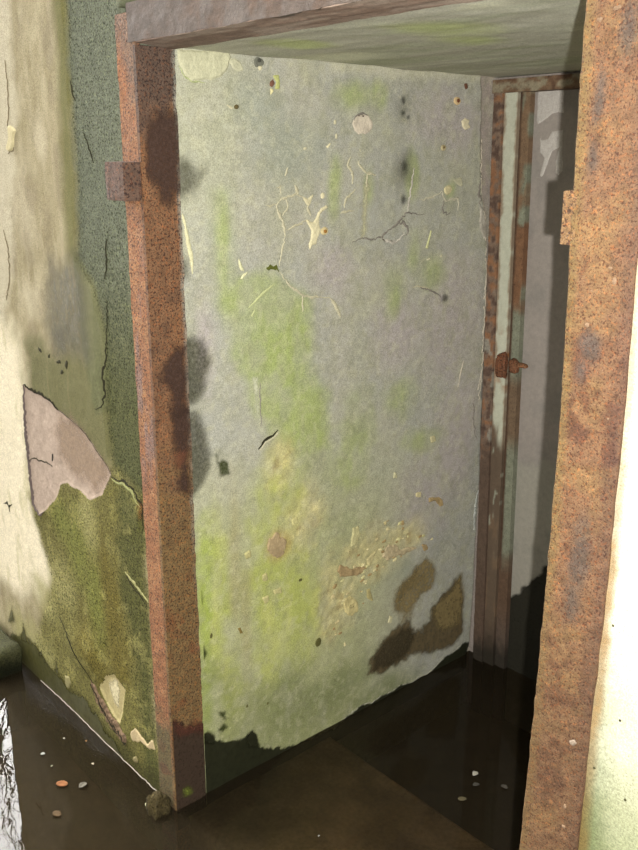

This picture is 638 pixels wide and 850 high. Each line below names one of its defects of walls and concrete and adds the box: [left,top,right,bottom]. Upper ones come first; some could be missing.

spalling [352,112,373,134]
crack [102,239,110,279]
crack [266,149,463,317]
crack [95,300,108,410]
spalling [22,384,111,516]
crack [253,378,279,451]
flaking render [331,520,433,646]
leakage [7,627,152,796]
spalling [100,674,126,723]
spalling [130,728,155,750]
leakage [172,559,469,830]